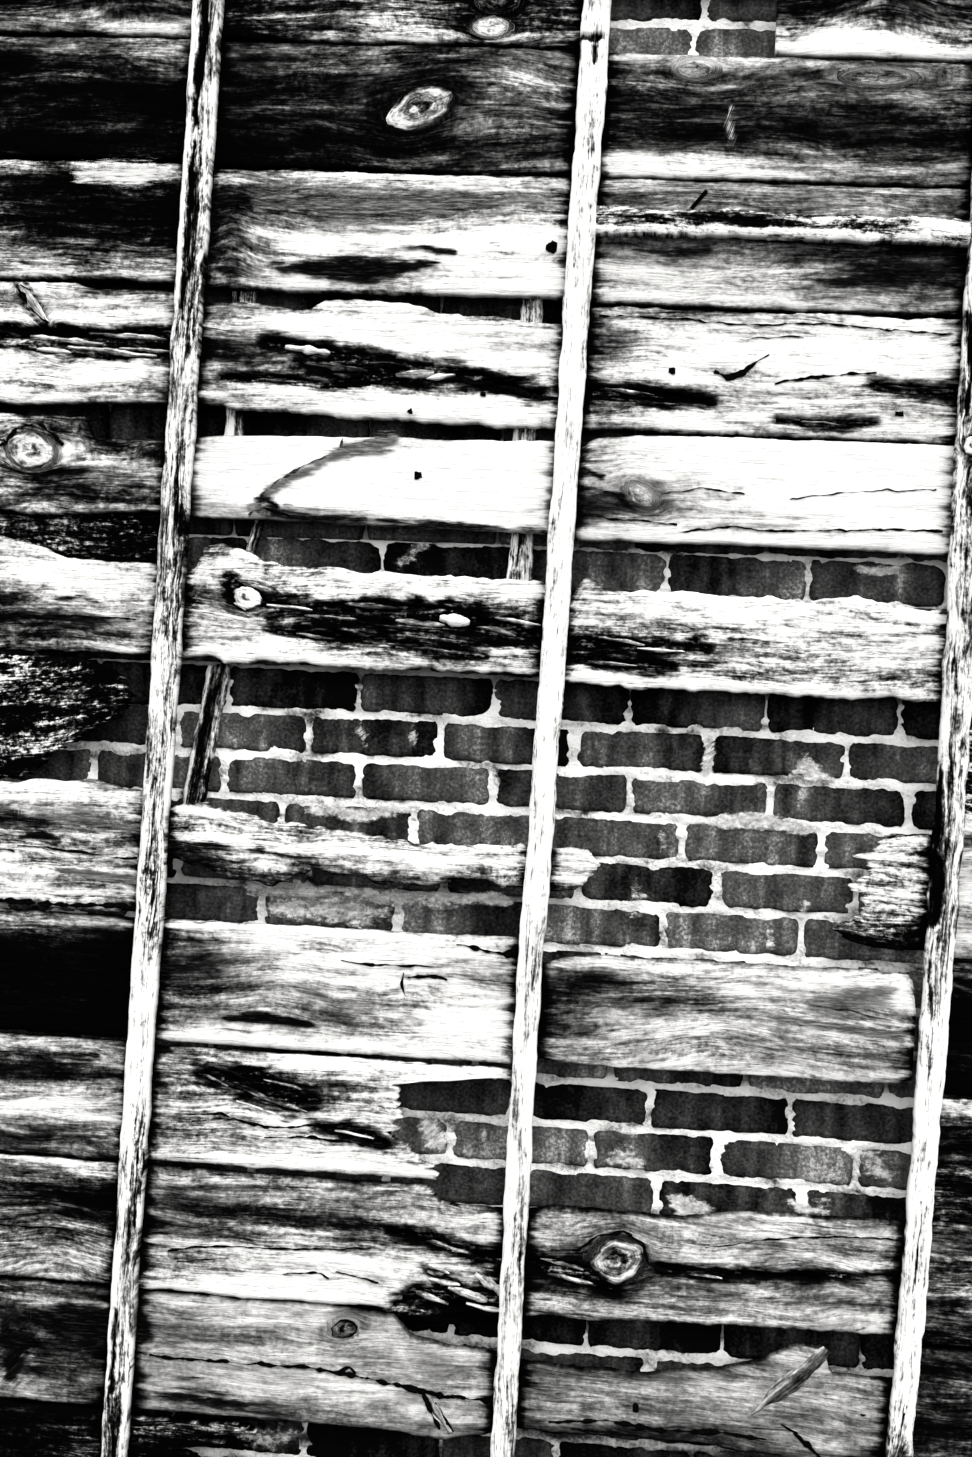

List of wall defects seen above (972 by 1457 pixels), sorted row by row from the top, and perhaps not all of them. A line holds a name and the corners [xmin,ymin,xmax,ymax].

crack [149,1353,494,1432]